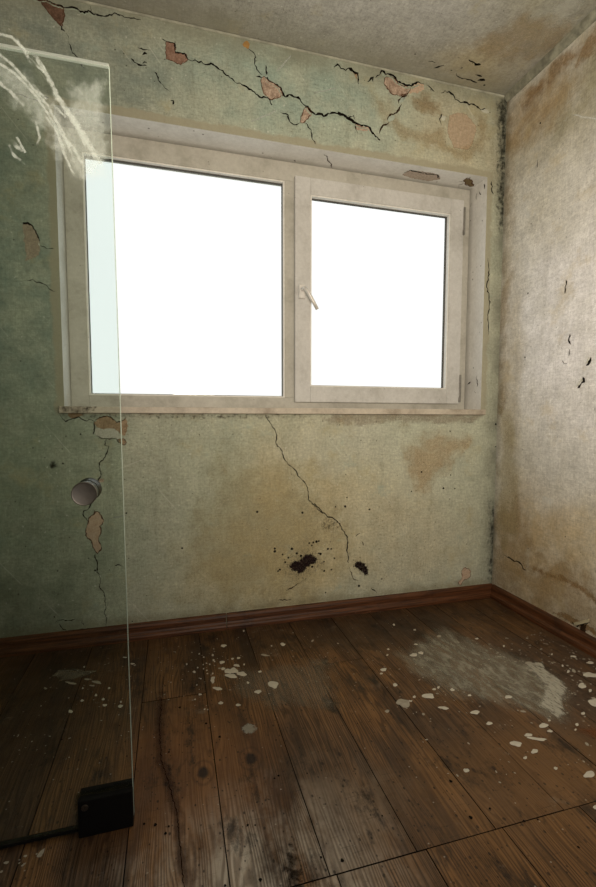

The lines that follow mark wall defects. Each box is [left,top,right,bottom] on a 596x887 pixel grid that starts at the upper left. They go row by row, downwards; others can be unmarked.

crack [34,0,141,20]
spalling [36,0,84,68]
crack [131,48,171,92]
spalling [162,39,188,65]
crack [188,59,491,142]
crack [62,413,93,422]
spalling [93,416,128,445]
crack [98,441,109,483]
crack [266,417,377,593]
water stain [273,540,335,574]
water stain [353,562,369,576]
crack [57,555,107,631]